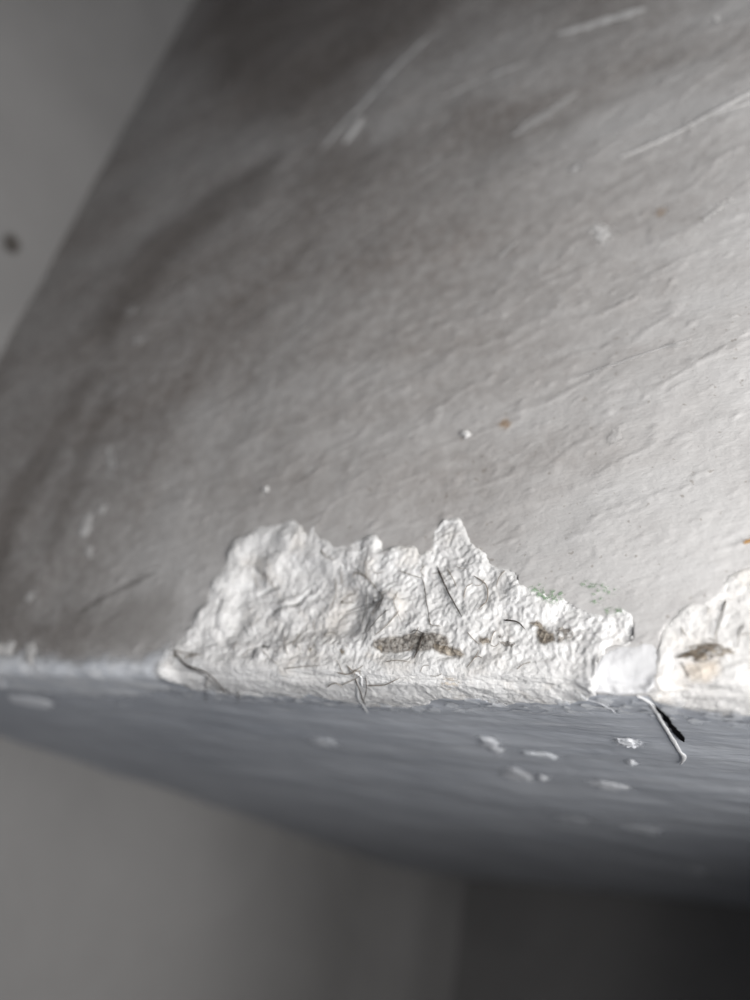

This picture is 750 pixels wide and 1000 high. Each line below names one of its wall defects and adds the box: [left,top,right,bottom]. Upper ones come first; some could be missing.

flaking render [0,518,750,727]